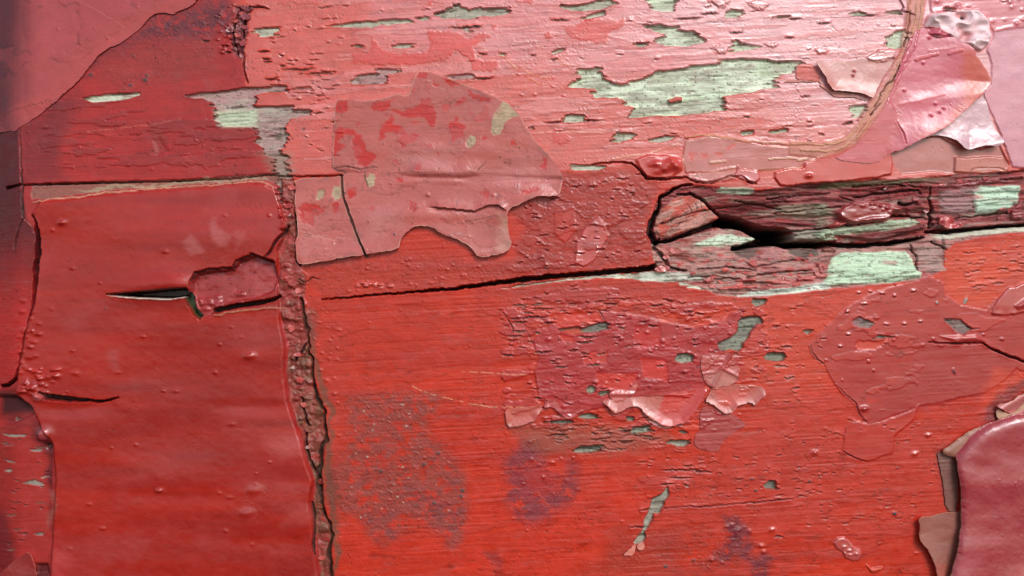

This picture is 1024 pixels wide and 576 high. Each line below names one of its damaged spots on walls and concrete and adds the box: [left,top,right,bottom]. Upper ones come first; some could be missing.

peeling [0,0,196,133]
peeling [182,68,608,264]
peeling [560,0,1024,218]
crack [1,129,344,389]
peeling [184,252,303,332]
crack [321,265,695,385]
peeling [505,299,768,451]
peeling [691,233,754,248]
peeling [788,229,832,244]
peeling [802,250,1024,424]
peeling [572,445,606,455]
peeling [0,552,37,576]